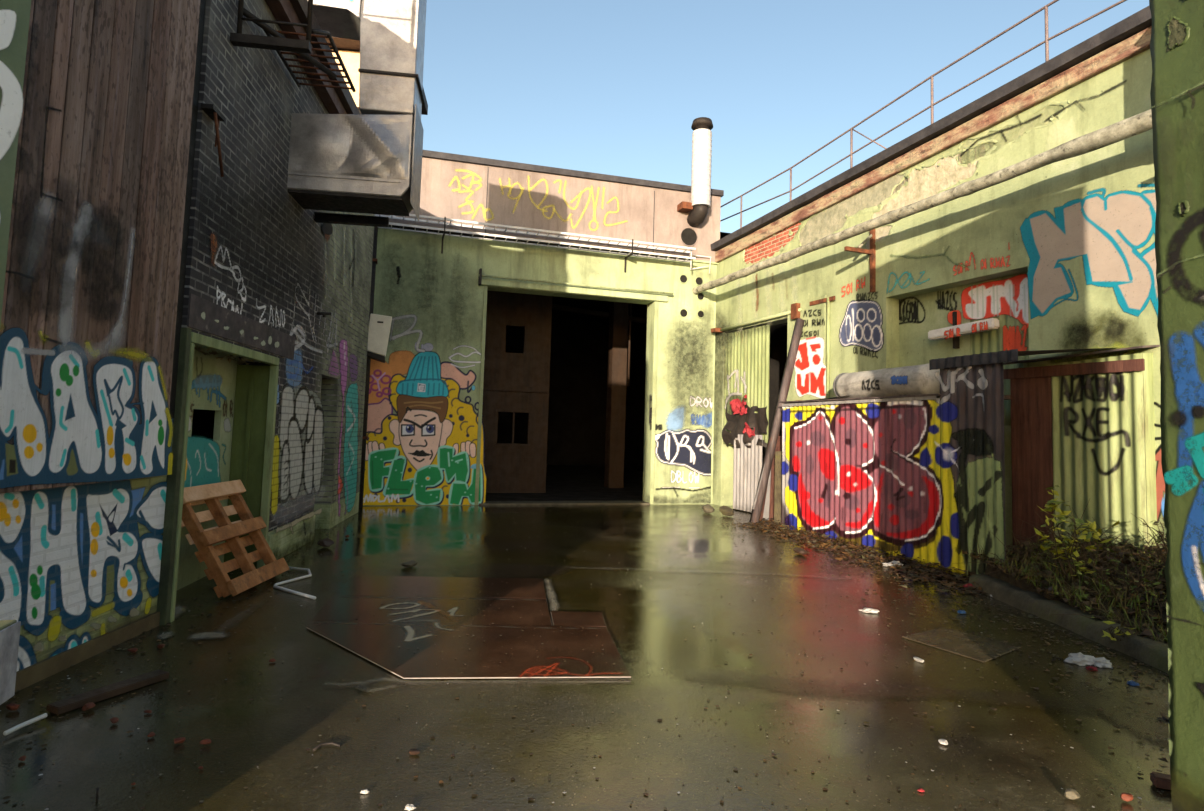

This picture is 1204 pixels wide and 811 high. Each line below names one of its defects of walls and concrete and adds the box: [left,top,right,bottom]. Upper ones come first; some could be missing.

peeling [742,100,1071,266]